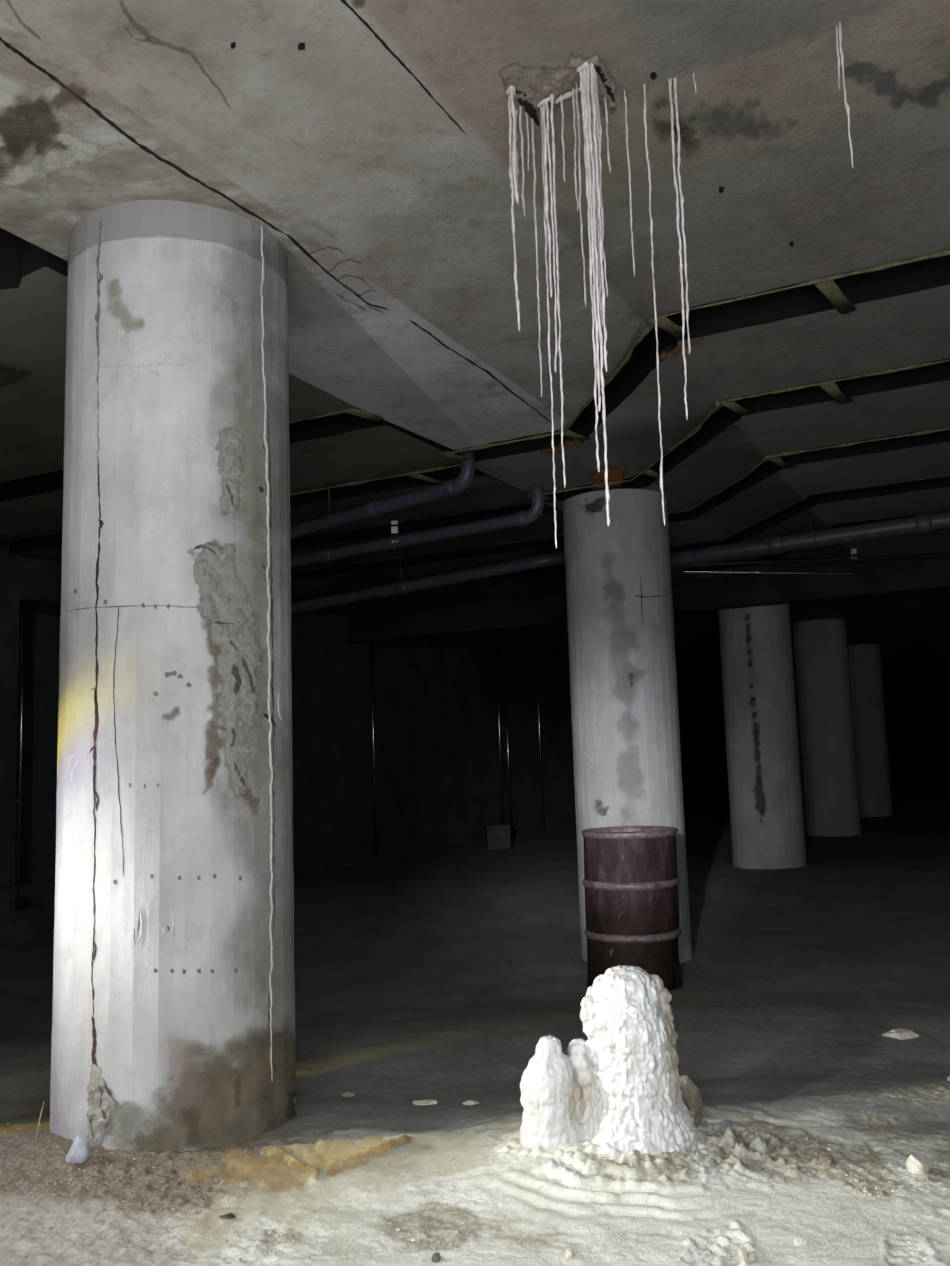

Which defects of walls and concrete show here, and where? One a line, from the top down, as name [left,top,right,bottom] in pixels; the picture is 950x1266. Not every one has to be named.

water stain [0,74,97,187]
crack [340,0,466,134]
spalling [499,54,616,126]
crack [0,37,552,423]
spalling [216,428,246,514]
water stain [235,296,285,537]
crack [89,221,124,1067]
water stain [206,619,221,786]
spalling [189,543,262,797]
water stain [245,670,295,1012]
spalling [86,1064,119,1146]
water stain [109,1032,297,1154]